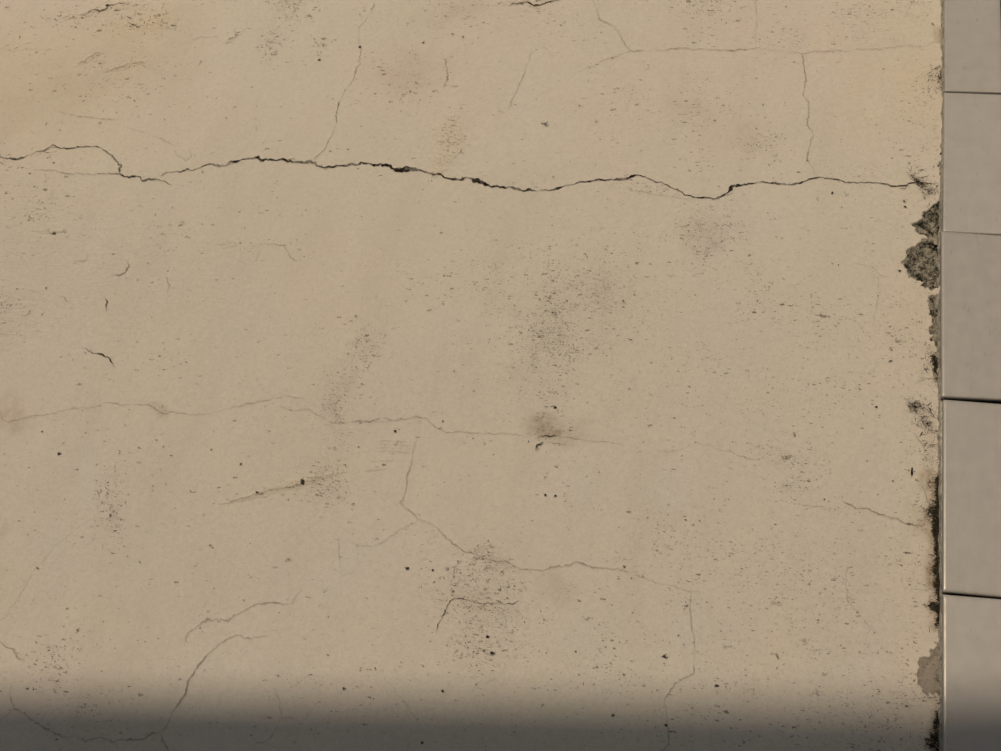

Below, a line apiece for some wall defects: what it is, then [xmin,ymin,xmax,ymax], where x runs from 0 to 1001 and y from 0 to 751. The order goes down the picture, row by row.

crack [8,144,929,199]
flaking render [899,201,940,348]
leakage [911,347,939,387]
mould [908,397,940,631]
mould [913,695,940,751]